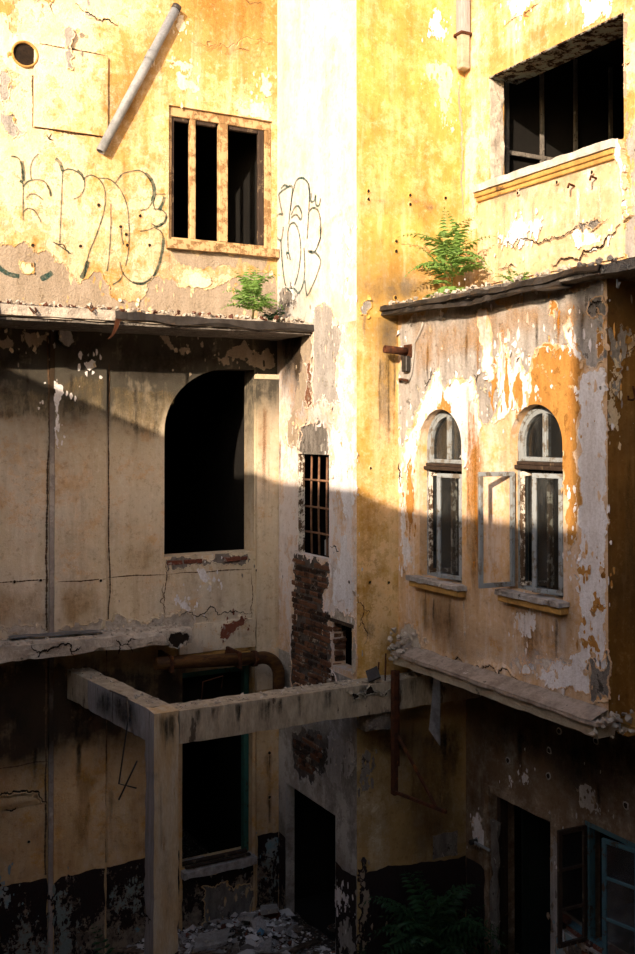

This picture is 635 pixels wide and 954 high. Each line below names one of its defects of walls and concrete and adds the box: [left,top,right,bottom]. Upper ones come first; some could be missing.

peeling [500,0,534,43]
flaking render [565,0,635,260]
peeling [494,208,543,260]
crack [498,219,620,270]
flaking render [0,221,391,702]
flaking render [396,279,635,705]
crack [160,584,251,618]
crack [0,790,47,812]
peeling [469,807,484,850]
flaking render [0,862,82,954]
flaking render [177,837,373,954]
flaking render [546,828,602,954]